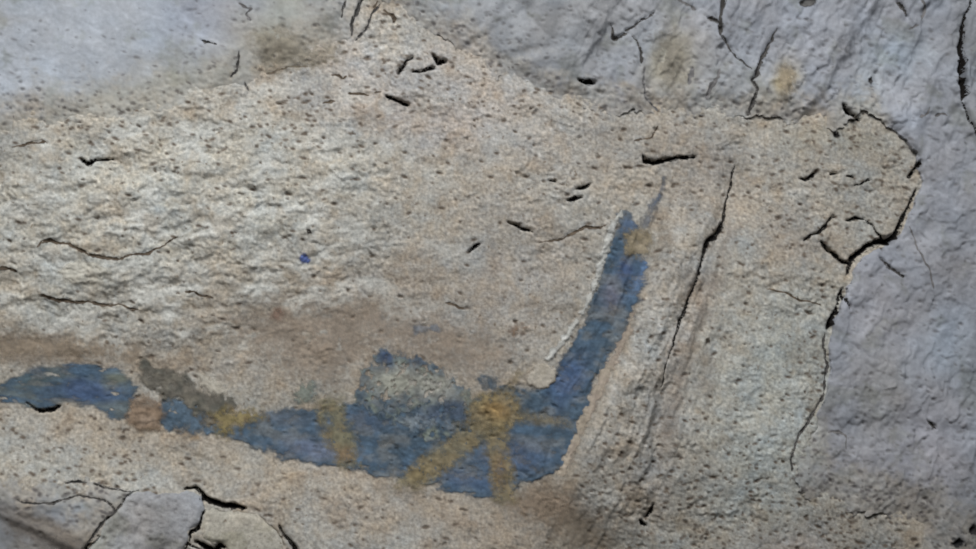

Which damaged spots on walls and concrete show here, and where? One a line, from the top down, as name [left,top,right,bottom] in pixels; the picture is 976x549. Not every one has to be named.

crack [842,104,859,121]
spalling [59,260,111,284]
crack [661,166,735,387]
crack [769,161,934,471]
spalling [196,373,226,395]
peeling [159,396,223,435]
crack [19,480,139,549]
crack [184,486,245,549]
spalling [183,500,284,549]
crack [278,525,299,549]